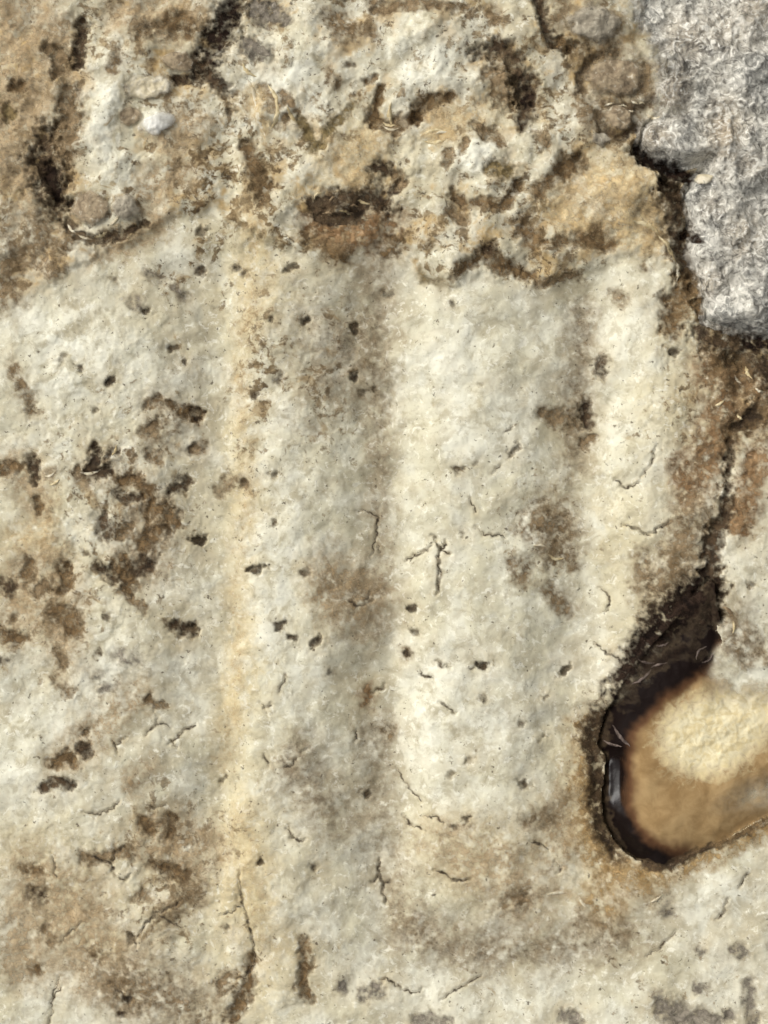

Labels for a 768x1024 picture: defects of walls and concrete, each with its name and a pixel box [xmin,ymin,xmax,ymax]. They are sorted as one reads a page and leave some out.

crack [407,543,450,591]
spalling [631,643,713,685]
spalling [603,726,630,747]
crack [223,880,256,978]